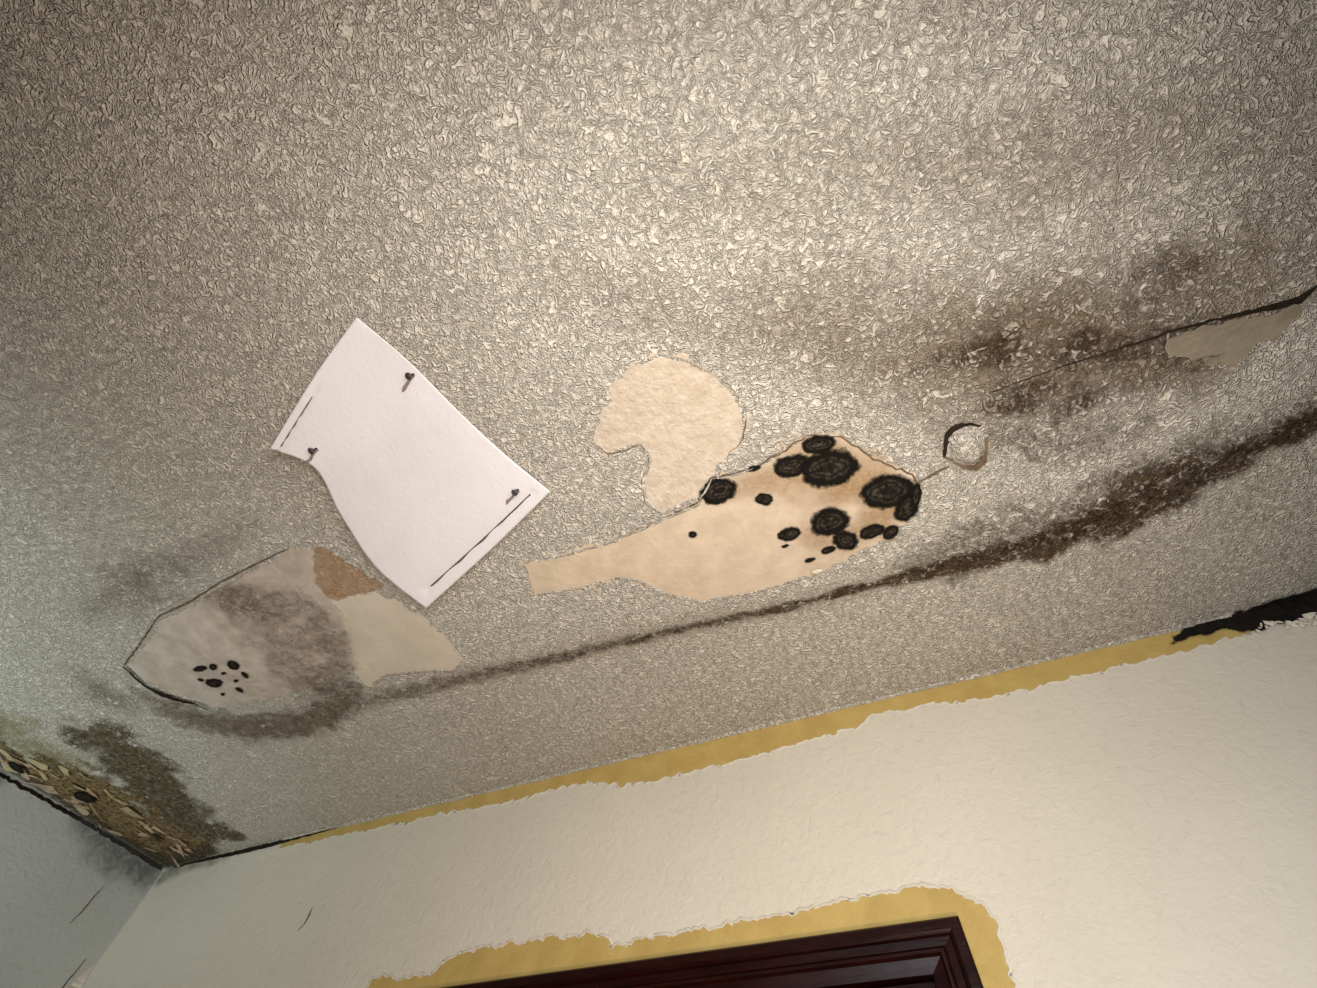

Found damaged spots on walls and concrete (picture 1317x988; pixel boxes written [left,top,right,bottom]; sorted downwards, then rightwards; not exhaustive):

damp [877,241,1275,415]
crack [991,285,1317,392]
peeling [519,351,949,603]
peeling [122,547,465,712]
damp [149,395,1317,739]
damp [0,720,245,881]
peeling [278,613,1252,851]
peeling [367,881,1020,988]